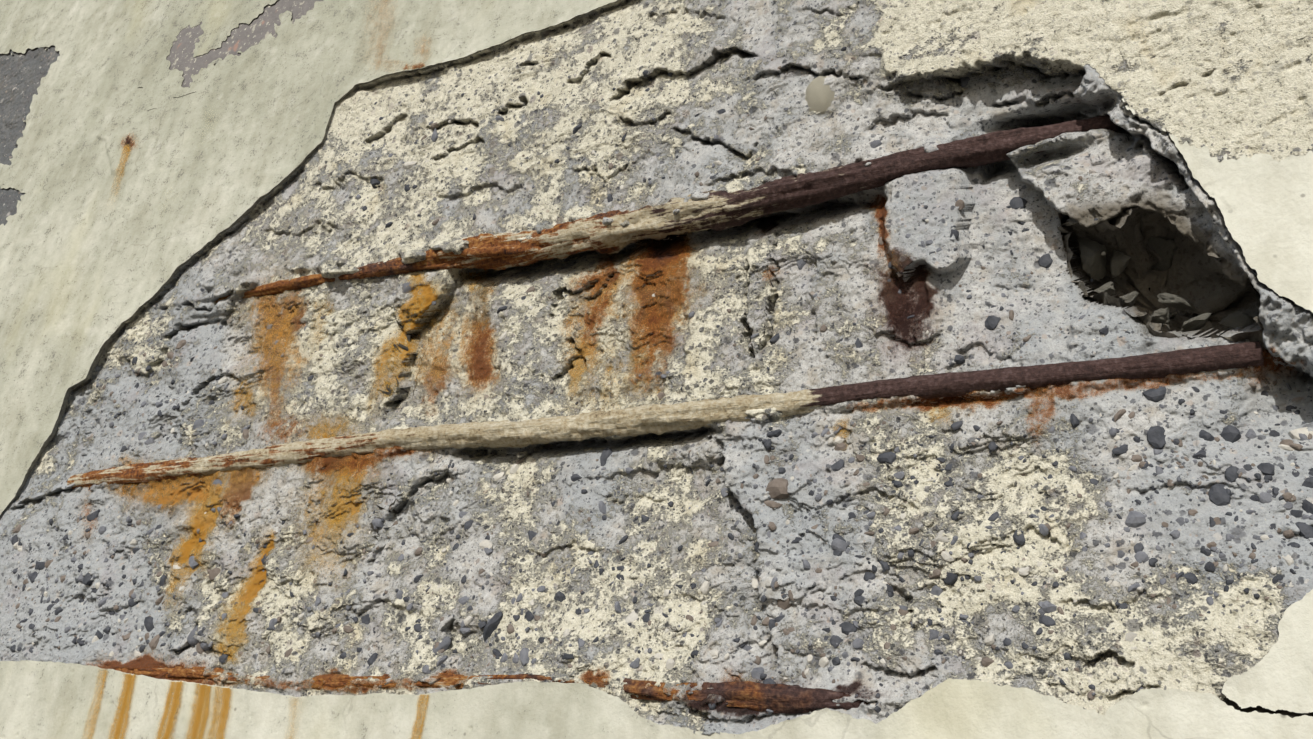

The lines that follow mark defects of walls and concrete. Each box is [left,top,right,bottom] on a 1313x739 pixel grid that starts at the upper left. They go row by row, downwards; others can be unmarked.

peeling [0,45,60,165]
peeling [166,0,324,88]
peeling [872,0,1313,163]
spalling [0,72,400,517]
rust [375,271,496,400]
rust [566,234,692,387]
rust [867,195,938,350]
spalling [1147,236,1179,272]
rust [852,374,1220,432]
rust [109,467,260,590]
rust [90,534,429,739]
crack [1218,696,1313,718]